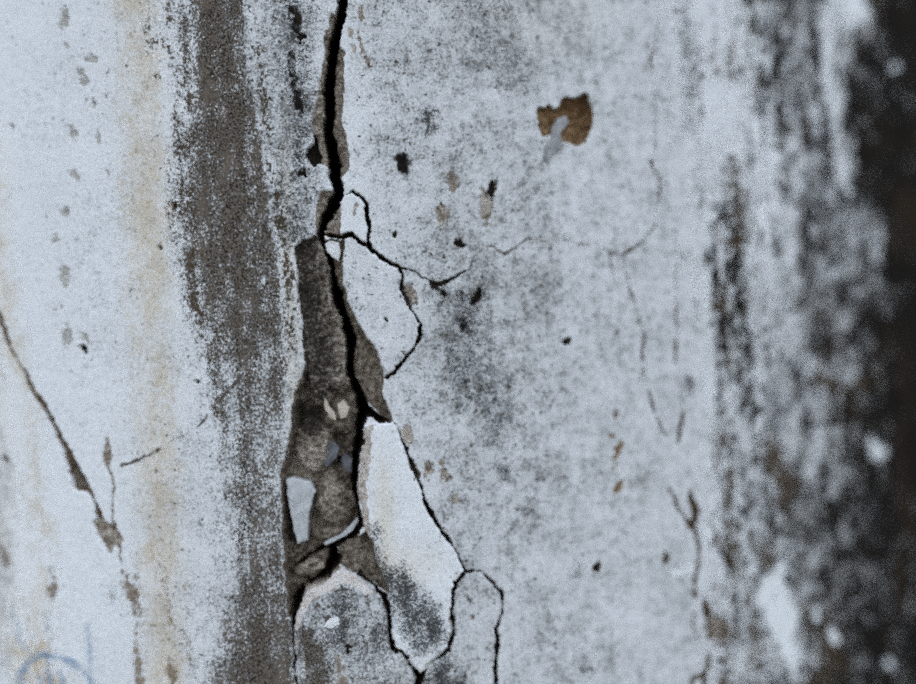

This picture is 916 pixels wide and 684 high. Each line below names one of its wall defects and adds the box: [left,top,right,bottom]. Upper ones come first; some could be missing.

crack [0,311,241,564]
water stain [142,0,471,684]
spalling [279,236,375,617]
spalling [401,283,418,307]
peeling [409,459,453,484]
spalling [435,202,451,227]
spalling [446,171,460,194]
crack [291,0,685,684]
spalling [479,181,498,227]
spalling [536,93,594,164]
water stain [687,0,916,684]
crack [667,487,731,684]